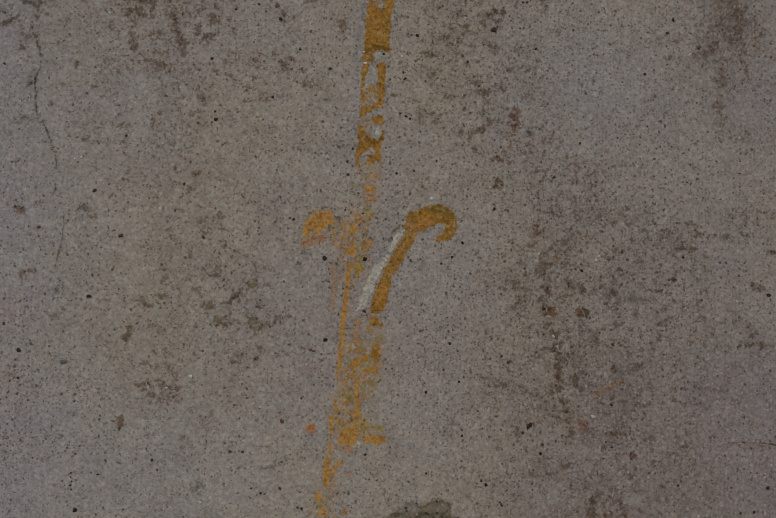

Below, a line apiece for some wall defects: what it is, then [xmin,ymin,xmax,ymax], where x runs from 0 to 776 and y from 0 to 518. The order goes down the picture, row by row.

flaking render [384,497,454,518]